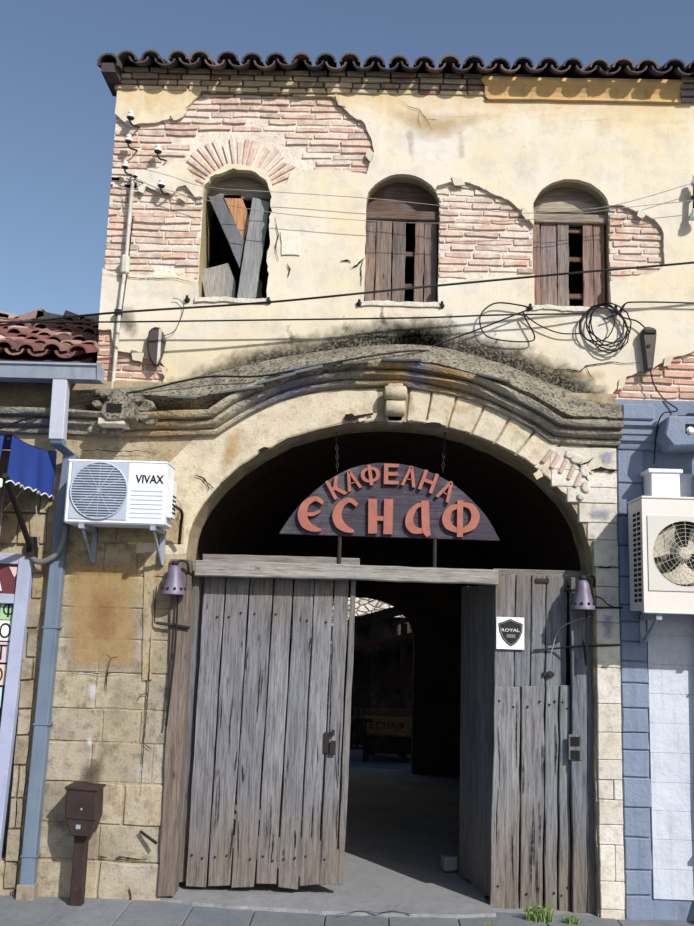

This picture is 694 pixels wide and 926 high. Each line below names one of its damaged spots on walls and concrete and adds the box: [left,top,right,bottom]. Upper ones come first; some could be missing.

flaking render [104,94,374,281]
flaking render [430,177,533,283]
flaking render [608,207,663,281]
flaking render [97,330,168,383]
leakage [194,308,603,394]
flaking render [613,351,694,401]
flaking render [533,449,595,501]